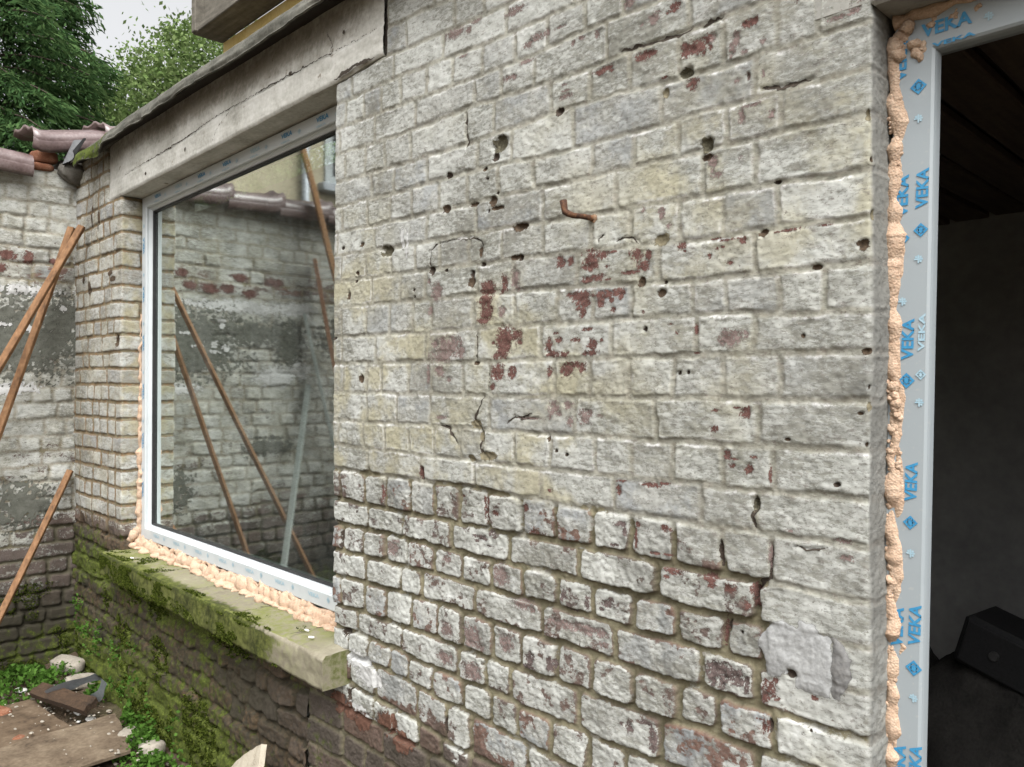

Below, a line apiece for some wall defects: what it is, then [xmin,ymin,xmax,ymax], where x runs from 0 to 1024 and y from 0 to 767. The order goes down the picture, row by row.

peeling [662,31,716,98]
peeling [729,14,760,59]
crack [430,237,484,270]
peeling [543,207,687,378]
crack [442,335,490,456]
peeling [473,495,499,547]
crack [751,498,828,588]
peeling [545,586,616,649]
peeling [435,621,486,682]
peeling [497,629,559,672]
peeling [330,690,416,755]
peeling [620,719,662,753]